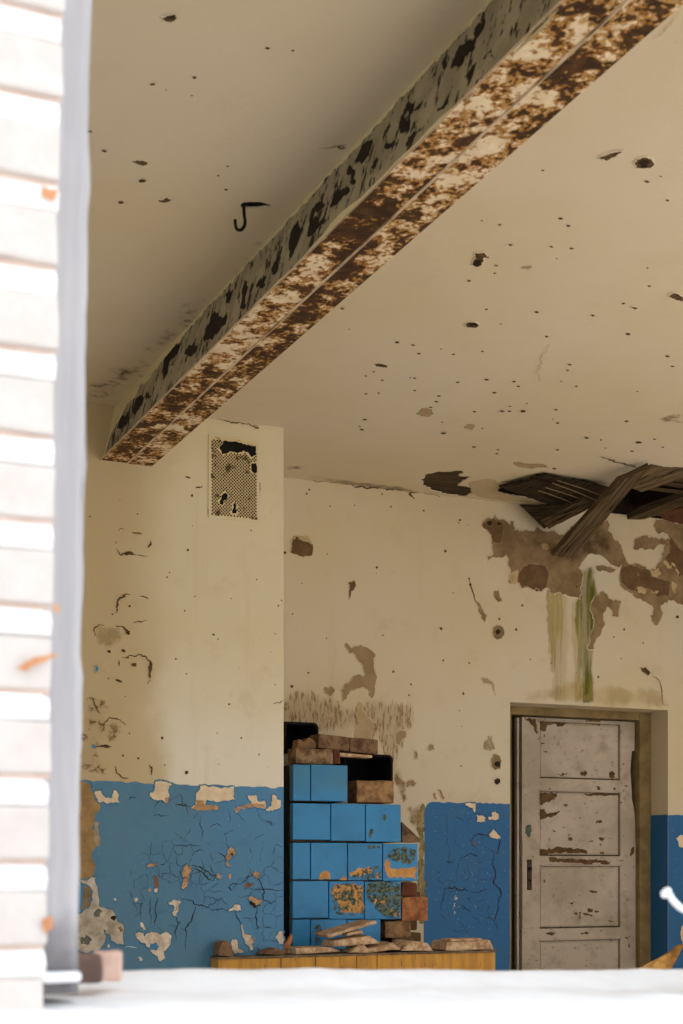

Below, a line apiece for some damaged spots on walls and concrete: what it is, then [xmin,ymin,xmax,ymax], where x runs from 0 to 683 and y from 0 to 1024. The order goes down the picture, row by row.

corrosion [102,0,683,466]
flaking render [284,535,314,558]
leakage [547,591,563,667]
flaking render [475,514,683,651]
peeling [323,642,378,739]
peeling [190,784,283,814]
peeling [464,802,502,840]
peeling [78,779,174,963]
peeling [145,861,193,918]
crack [129,795,285,955]
peeling [228,869,263,955]
crack [437,814,502,932]